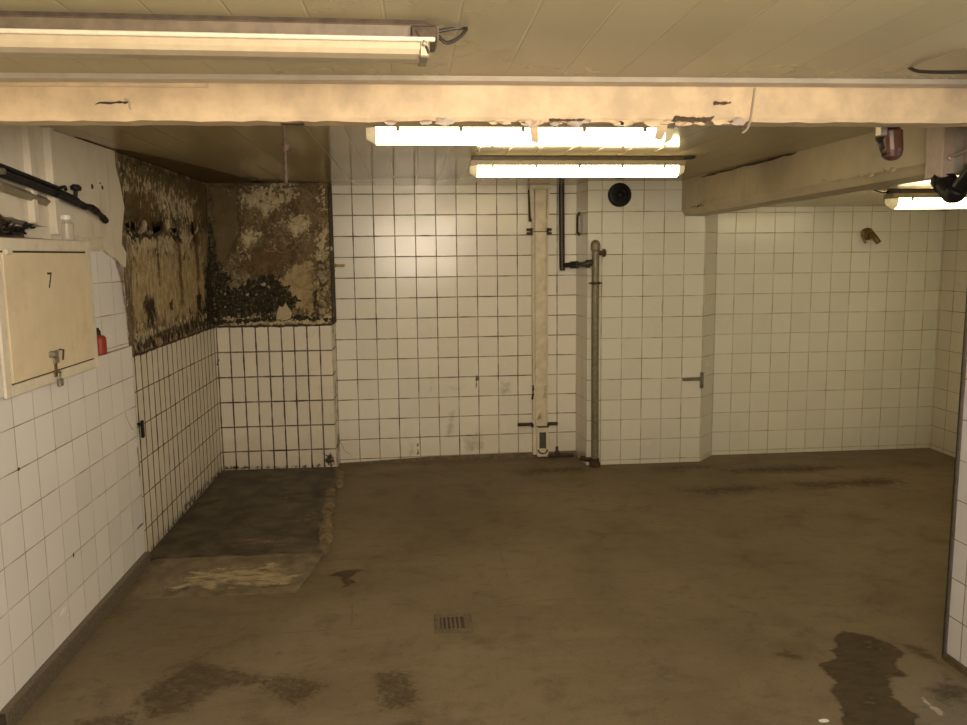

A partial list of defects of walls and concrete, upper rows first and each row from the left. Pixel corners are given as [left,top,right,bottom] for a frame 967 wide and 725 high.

water stain [75,137,311,183]
peeling [116,157,333,356]
water stain [135,206,333,353]
water stain [819,632,919,725]